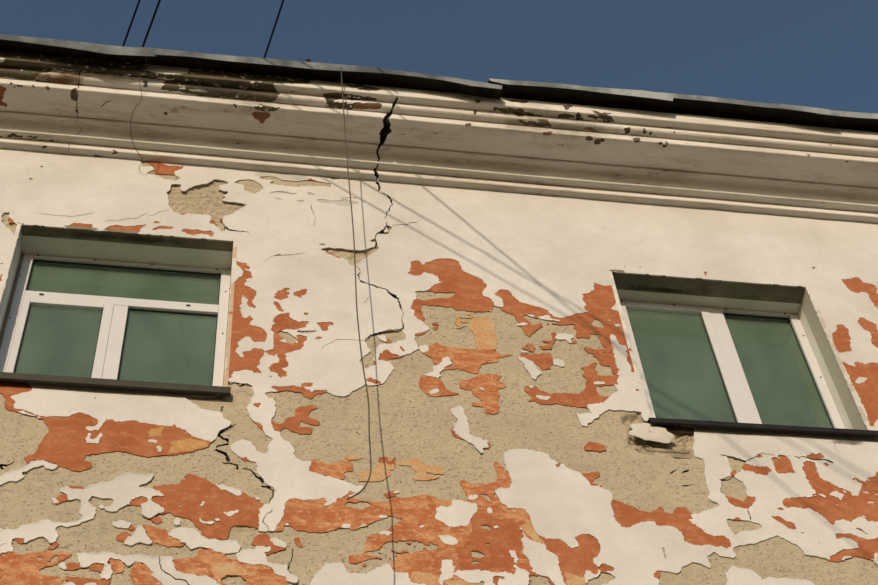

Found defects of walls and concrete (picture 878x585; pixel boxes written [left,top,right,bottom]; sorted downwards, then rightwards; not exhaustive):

flaking render [2,213,17,235]
peeling [0,132,54,148]
crack [0,58,206,150]
flaking render [0,51,312,123]
flaking render [68,161,357,236]
flaking render [321,227,391,265]
crack [373,87,415,249]
peeling [493,99,614,144]
peeling [624,127,675,148]
crack [323,269,404,347]
flaking render [0,258,878,585]
crack [215,406,274,530]